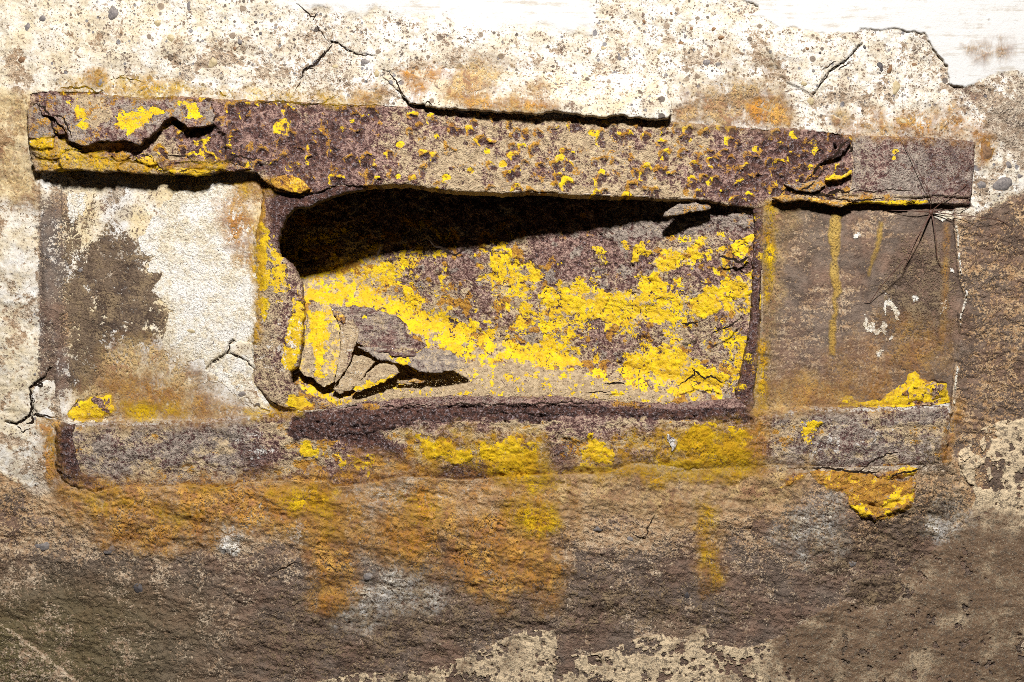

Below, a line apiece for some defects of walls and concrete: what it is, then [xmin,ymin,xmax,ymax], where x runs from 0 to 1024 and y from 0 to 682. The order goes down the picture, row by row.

crack [258,3,432,108]
crack [814,45,860,94]
crack [31,103,266,173]
damp [57,189,172,395]
crack [5,371,126,433]